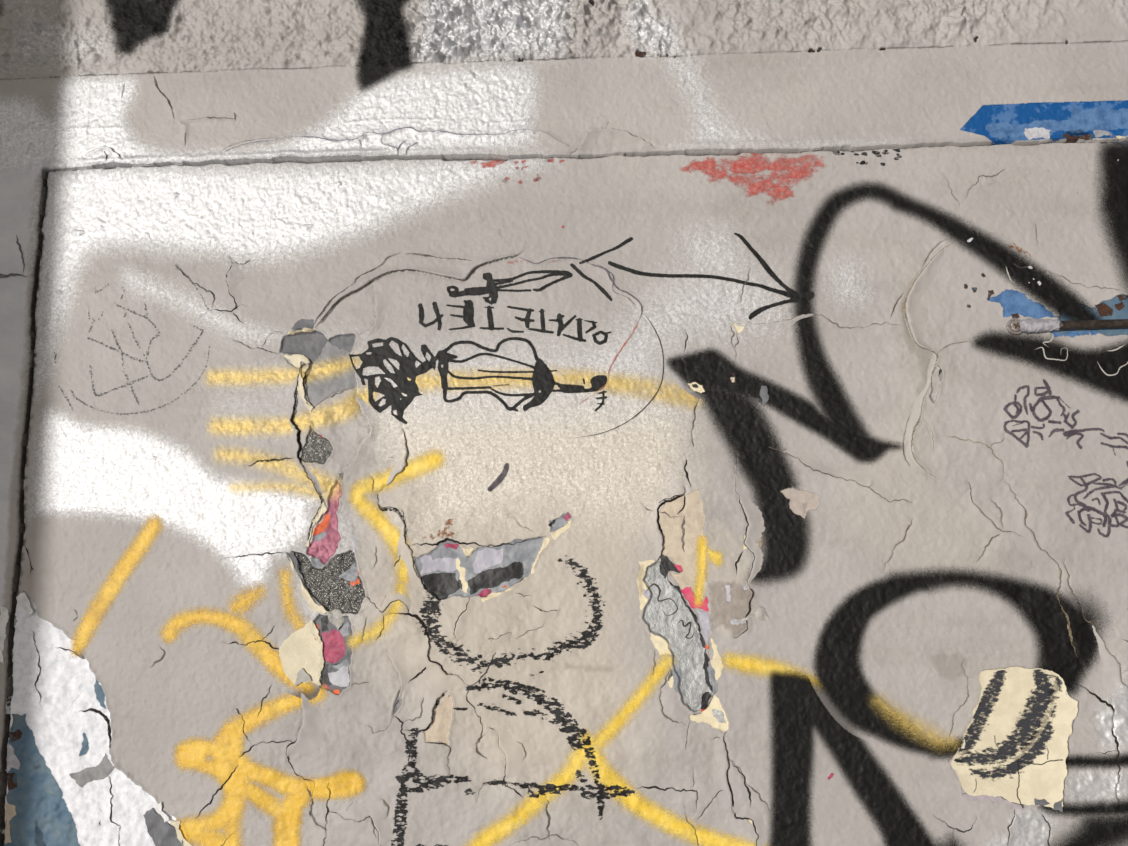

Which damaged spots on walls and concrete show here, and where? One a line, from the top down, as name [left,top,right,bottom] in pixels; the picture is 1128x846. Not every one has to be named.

peeling [960,100,1128,145]
peeling [280,319,357,411]
crack [645,333,699,560]
crack [731,313,896,358]
peeling [987,266,1128,338]
peeling [278,473,365,695]
crack [176,257,576,846]
peeling [659,490,708,600]
crack [734,460,766,638]
crack [947,433,1128,811]
peeling [0,592,193,846]
crack [637,653,770,846]